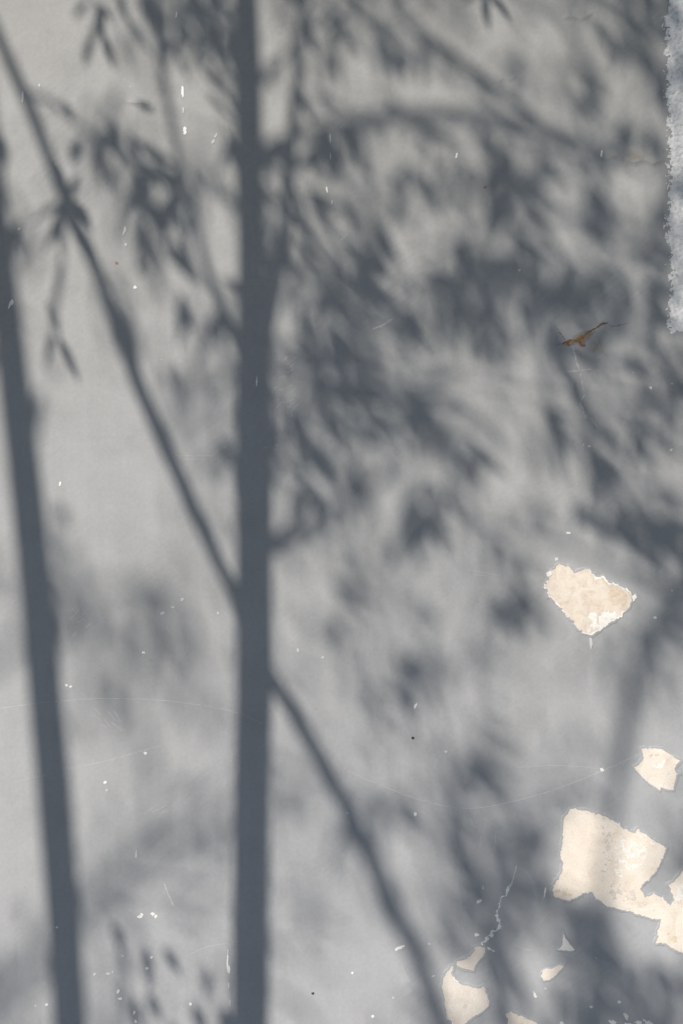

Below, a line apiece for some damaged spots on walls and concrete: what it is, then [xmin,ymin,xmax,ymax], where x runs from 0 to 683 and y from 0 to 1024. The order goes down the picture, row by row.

peeling [662,0,683,334]
peeling [542,558,637,649]
peeling [631,745,683,793]
crack [475,866,517,952]
peeling [544,806,683,955]
peeling [431,944,541,1024]
peeling [533,932,577,998]